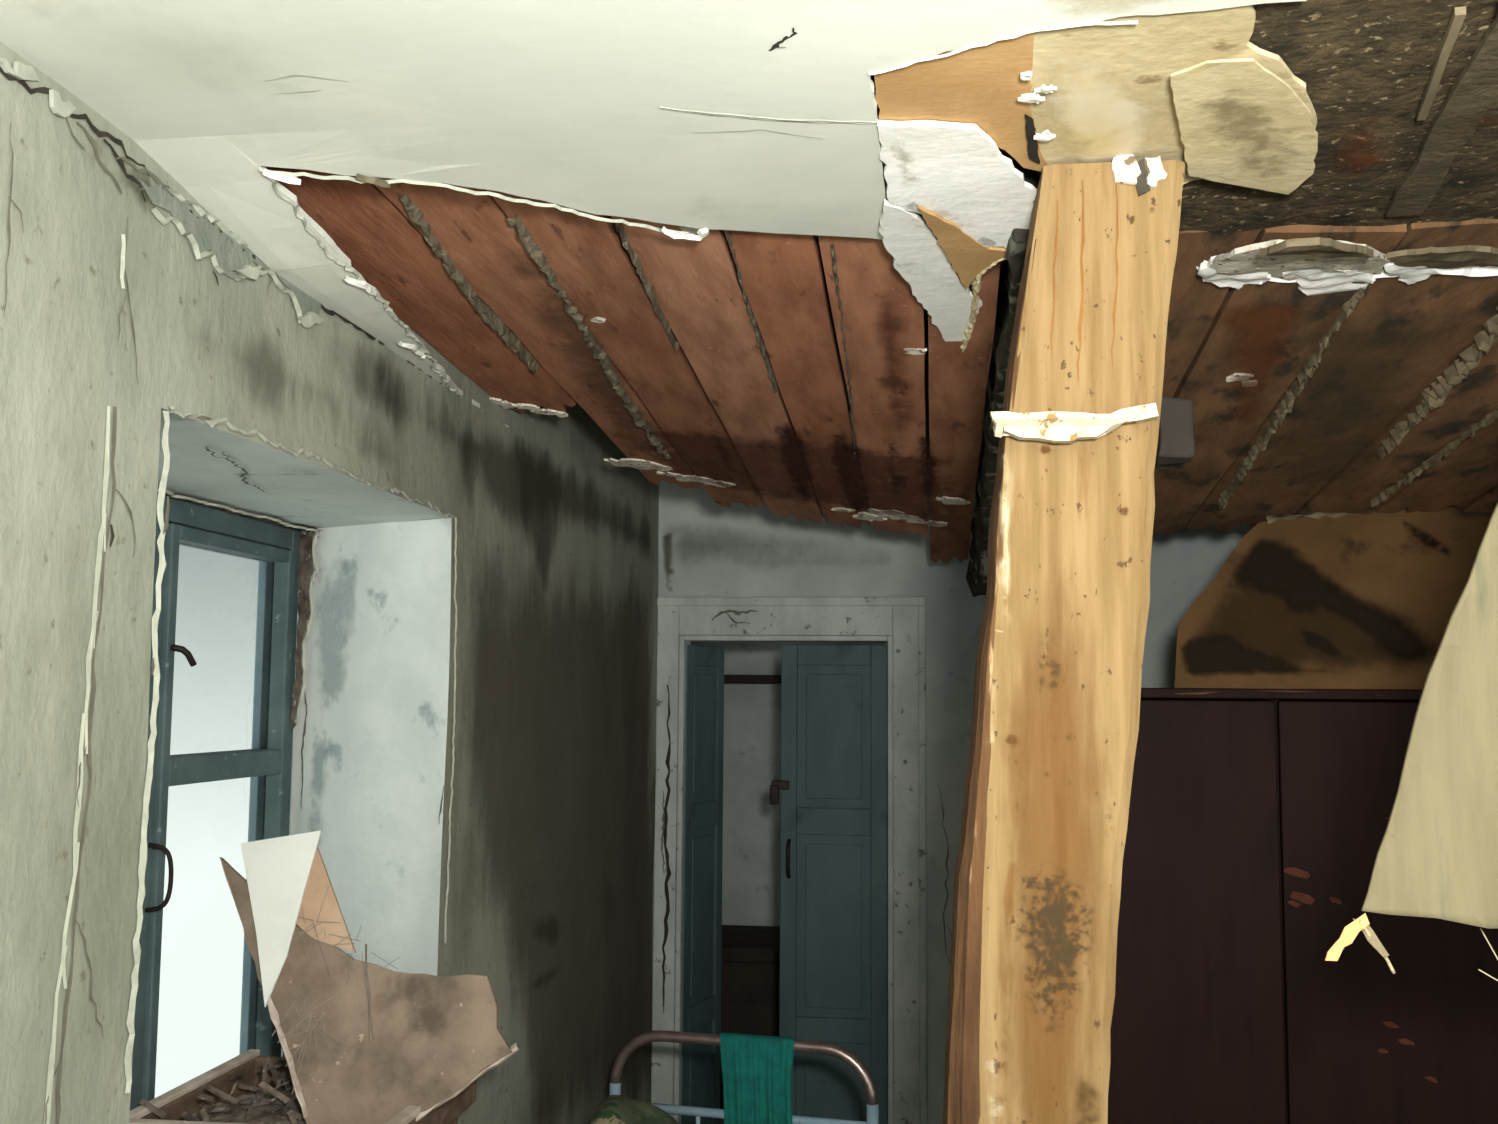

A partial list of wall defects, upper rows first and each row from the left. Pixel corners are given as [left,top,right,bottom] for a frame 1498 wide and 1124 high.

flaking render [139,178,323,328]
peeling [259,167,710,427]
flaking render [1196,237,1498,296]
crack [321,304,442,384]
water stain [464,445,672,578]
flaking render [604,458,736,488]
water stain [777,426,812,496]
water stain [833,435,868,510]
flaking render [831,496,971,527]
water stain [891,438,936,495]
crack [0,57,273,1124]
crack [661,685,671,1013]